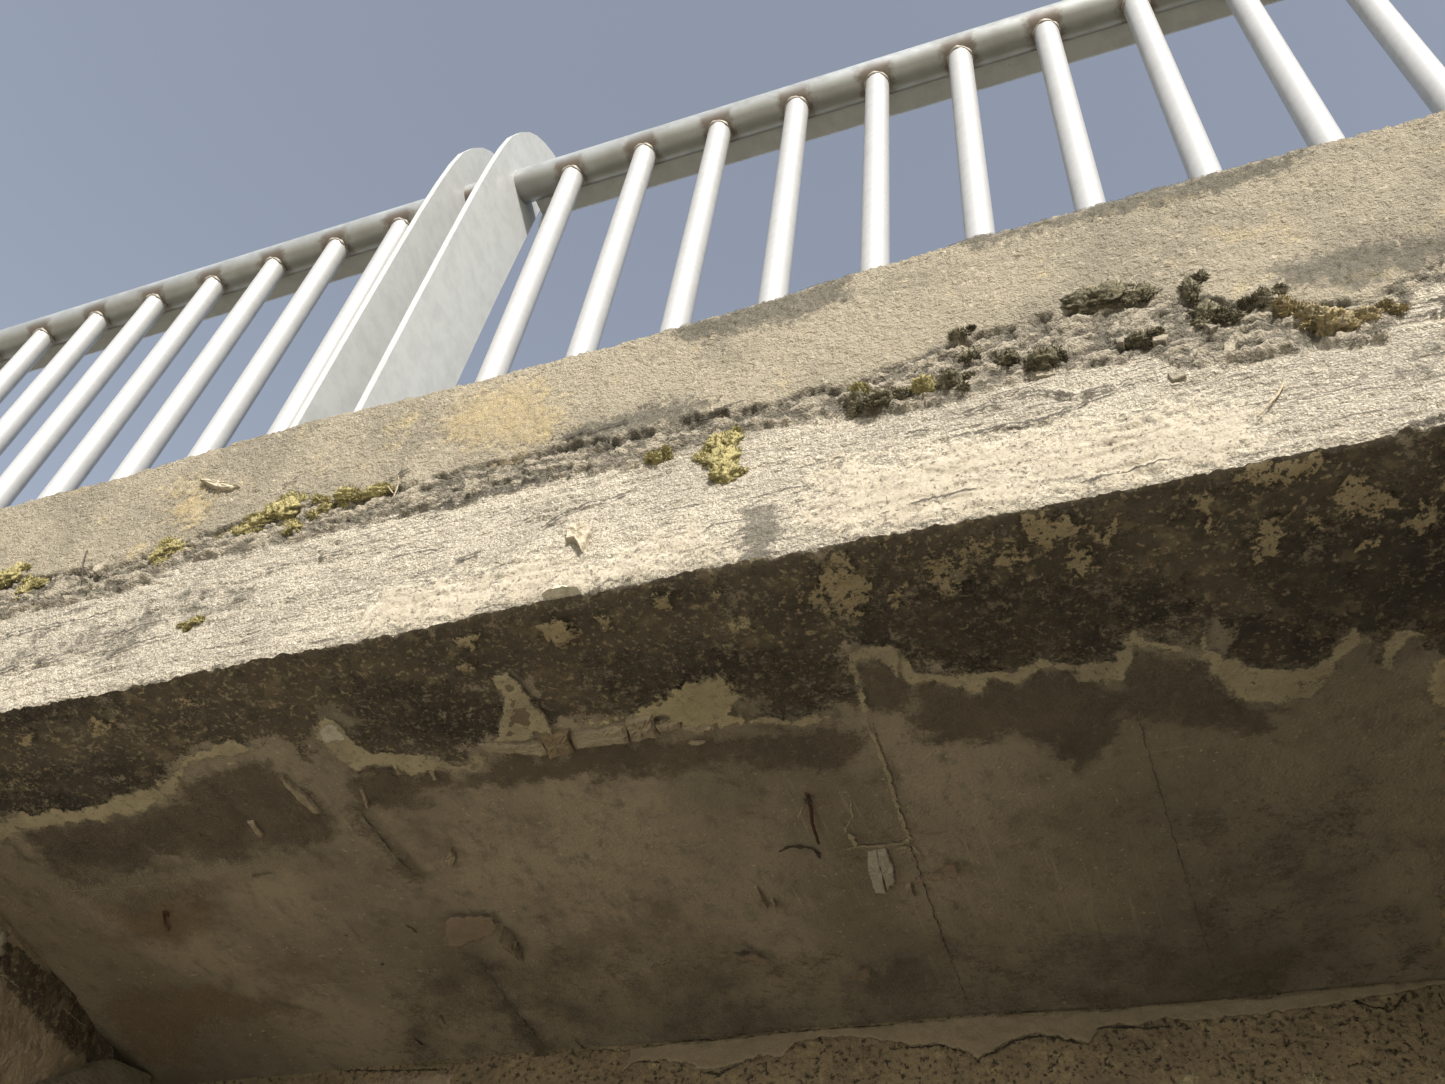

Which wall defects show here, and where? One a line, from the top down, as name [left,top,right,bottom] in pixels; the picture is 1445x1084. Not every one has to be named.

peeling [1152,334,1169,348]
peeling [1197,324,1238,356]
peeling [1034,368,1056,380]
peeling [1167,368,1187,383]
leakage [0,424,1445,884]
leakage [0,942,127,1063]
crack [482,962,1186,1075]
crack [1354,990,1445,1045]
crack [343,1038,451,1073]